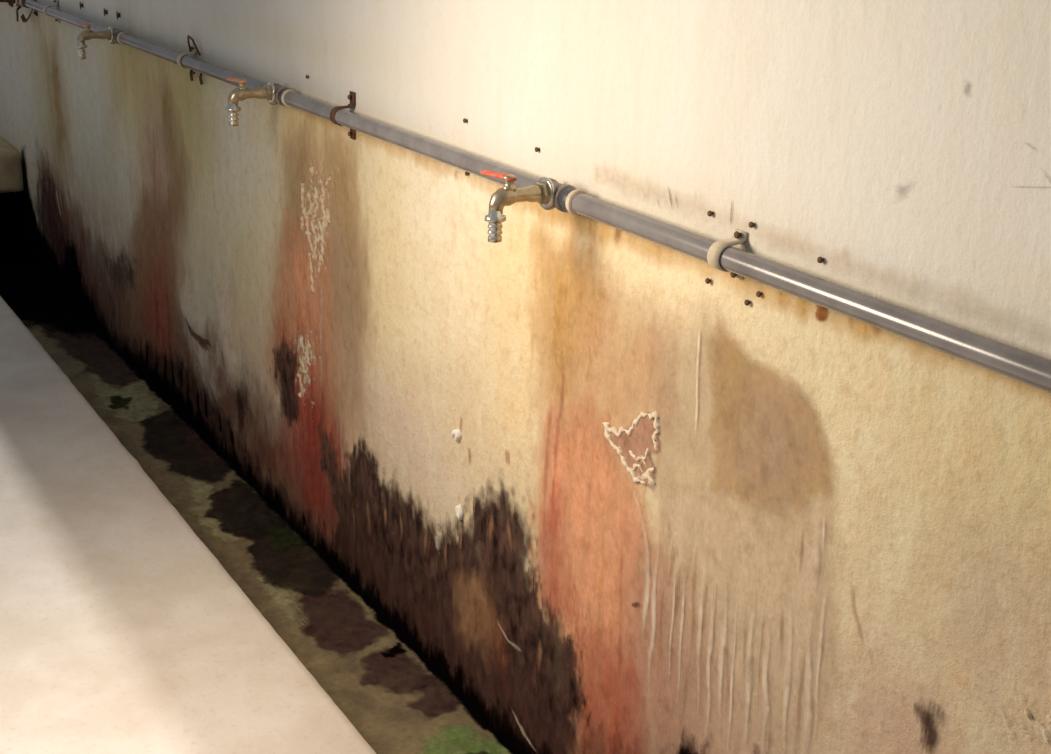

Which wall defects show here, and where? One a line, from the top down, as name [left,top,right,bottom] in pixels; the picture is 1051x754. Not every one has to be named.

rust [125,103,182,354]
leakage [0,150,588,754]
rust [279,162,352,524]
rust [540,266,691,754]
flaking render [602,411,661,487]
leakage [643,338,828,742]
leakage [677,735,695,754]
leakage [914,703,940,750]